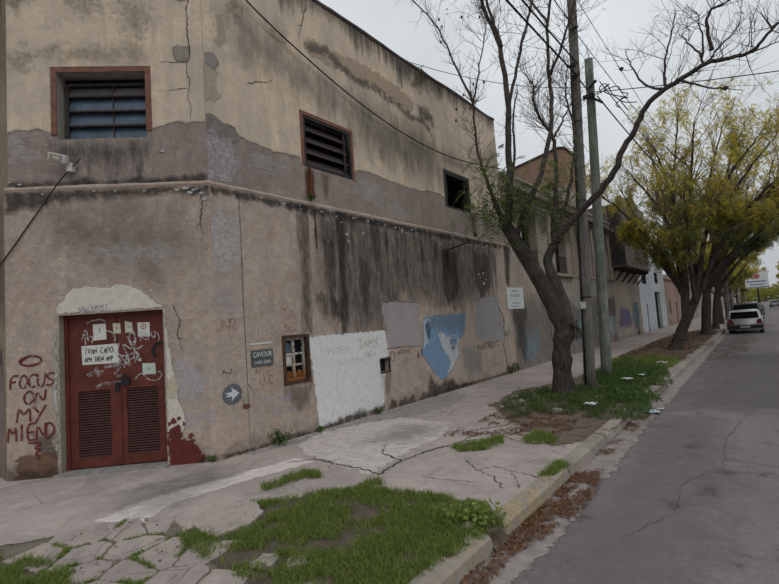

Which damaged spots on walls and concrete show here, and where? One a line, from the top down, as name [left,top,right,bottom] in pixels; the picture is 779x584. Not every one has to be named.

crack [163,0,192,117]
leakage [307,45,429,129]
corrosion [305,169,314,195]
leakage [314,211,492,332]
flaking render [14,283,206,481]